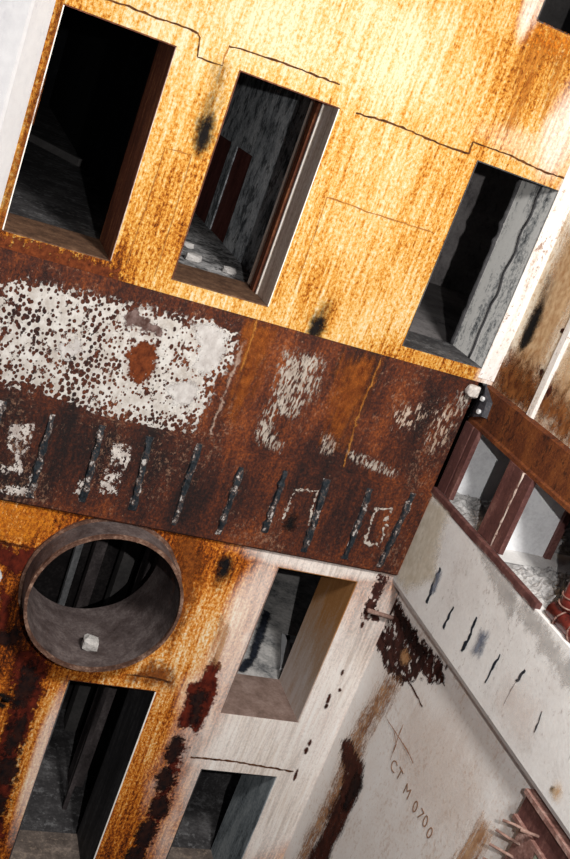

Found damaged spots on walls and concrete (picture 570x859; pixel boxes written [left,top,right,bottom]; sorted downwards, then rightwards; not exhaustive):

crack [108,0,340,85]
rust [505,18,570,132]
crack [356,112,565,179]
peeling [0,277,247,435]
rust [123,308,162,385]
peeling [256,350,324,451]
rust [325,357,381,466]
rust [493,236,570,447]
rust [0,501,67,848]
rust [124,615,229,859]
rust [297,676,399,859]
rust [454,821,490,859]